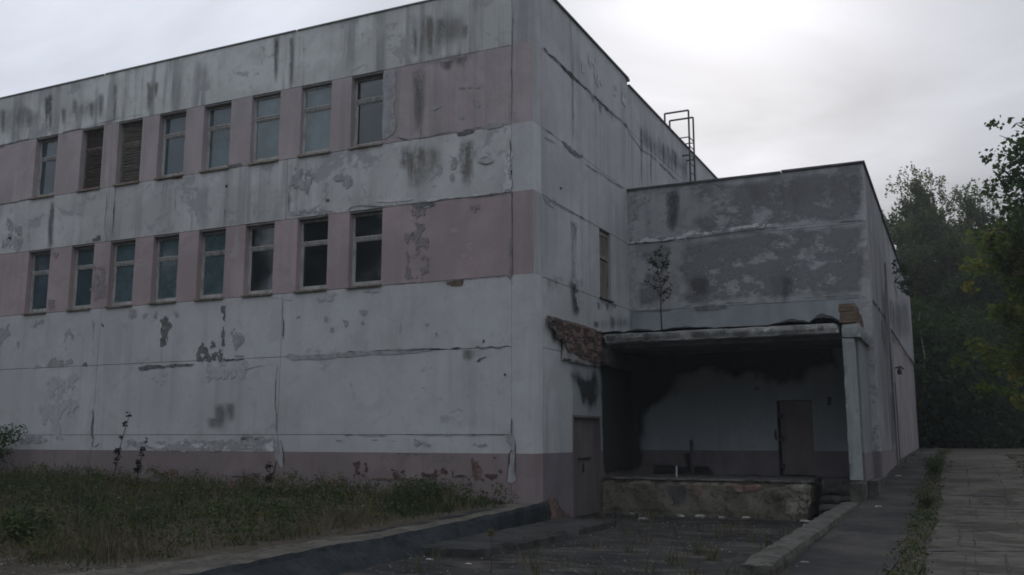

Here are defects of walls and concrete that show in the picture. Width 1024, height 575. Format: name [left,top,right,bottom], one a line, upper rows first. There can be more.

peeling [376,196,448,280]
peeling [128,308,179,347]
peeling [196,306,245,362]
spalling [549,319,604,363]